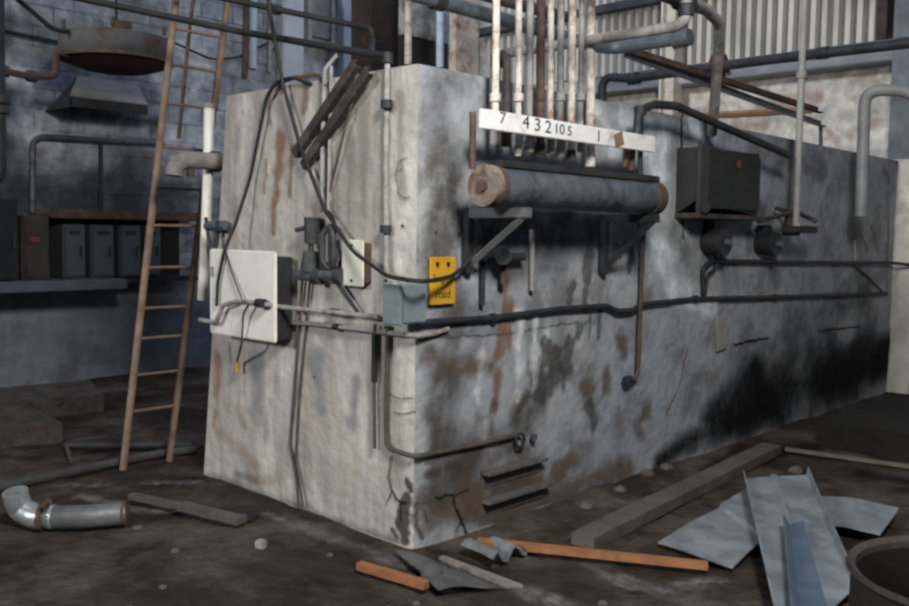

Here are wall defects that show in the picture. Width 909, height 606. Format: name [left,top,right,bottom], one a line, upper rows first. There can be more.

rust [264,132,293,235]
leakage [474,351,484,405]
leakage [514,309,550,428]
leakage [551,451,575,480]